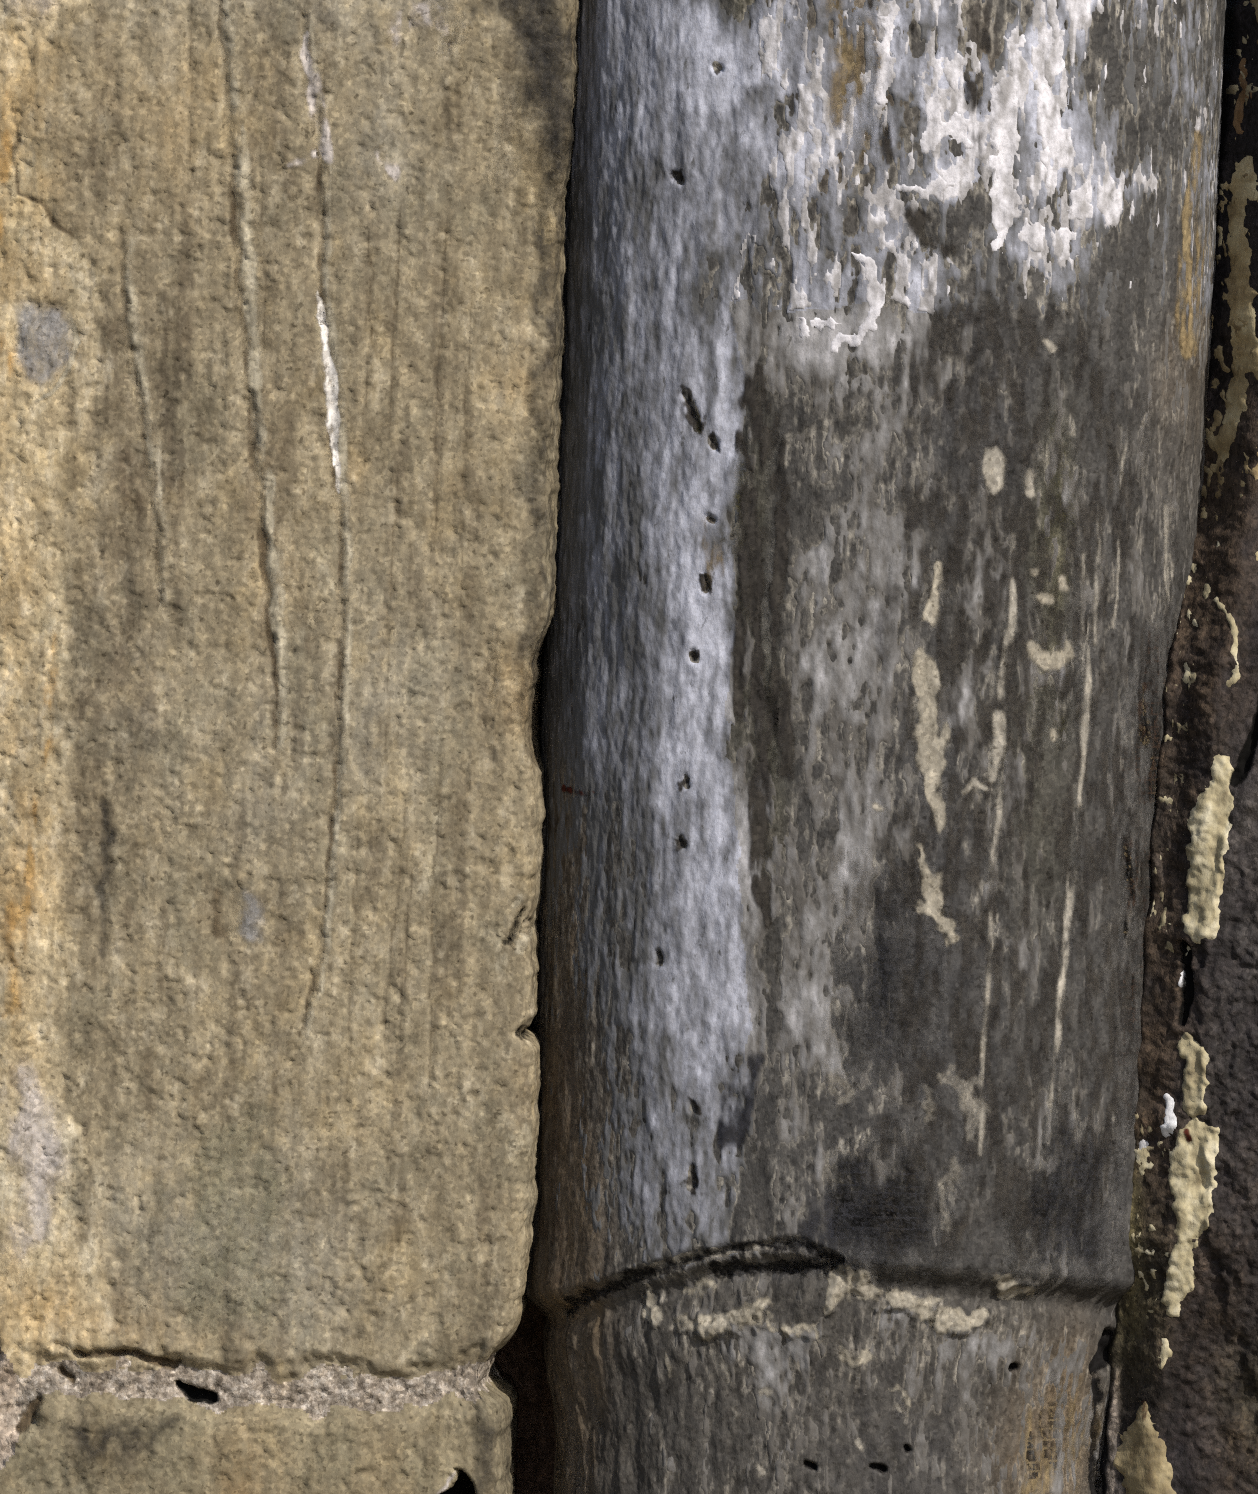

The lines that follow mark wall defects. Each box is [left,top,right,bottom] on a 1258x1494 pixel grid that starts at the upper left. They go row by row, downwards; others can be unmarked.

leakage [831,30,862,123]
leakage [880,125,893,164]
leakage [966,81,979,110]
leakage [905,206,956,258]
leakage [1175,131,1204,359]
leakage [911,294,1053,466]
leakage [707,365,795,930]
peeling [503,0,1258,1494]
leakage [807,323,1168,1263]
leakage [10,1078,61,1242]
leakage [718,1054,764,1149]
crack [563,1240,844,1315]